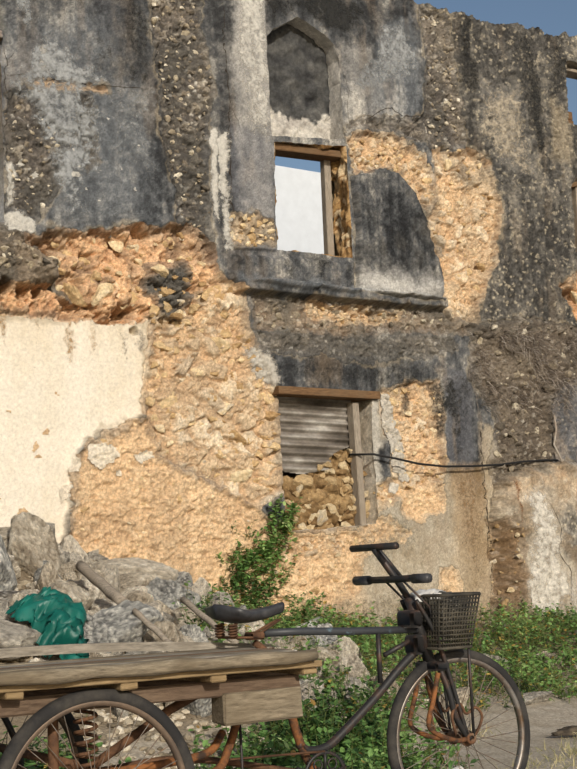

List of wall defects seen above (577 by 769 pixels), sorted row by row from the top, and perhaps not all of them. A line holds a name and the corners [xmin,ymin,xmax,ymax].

damp [17,0,31,25]
damp [11,36,107,213]
damp [460,15,545,171]
efflorescence [4,161,36,233]
efflorescence [209,128,234,251]
spalling [251,4,577,485]
spalling [0,0,413,617]
efflorescence [243,347,280,386]
damp [322,355,421,410]
spalling [373,378,450,524]
spalling [438,565,464,592]
spalling [484,512,530,622]